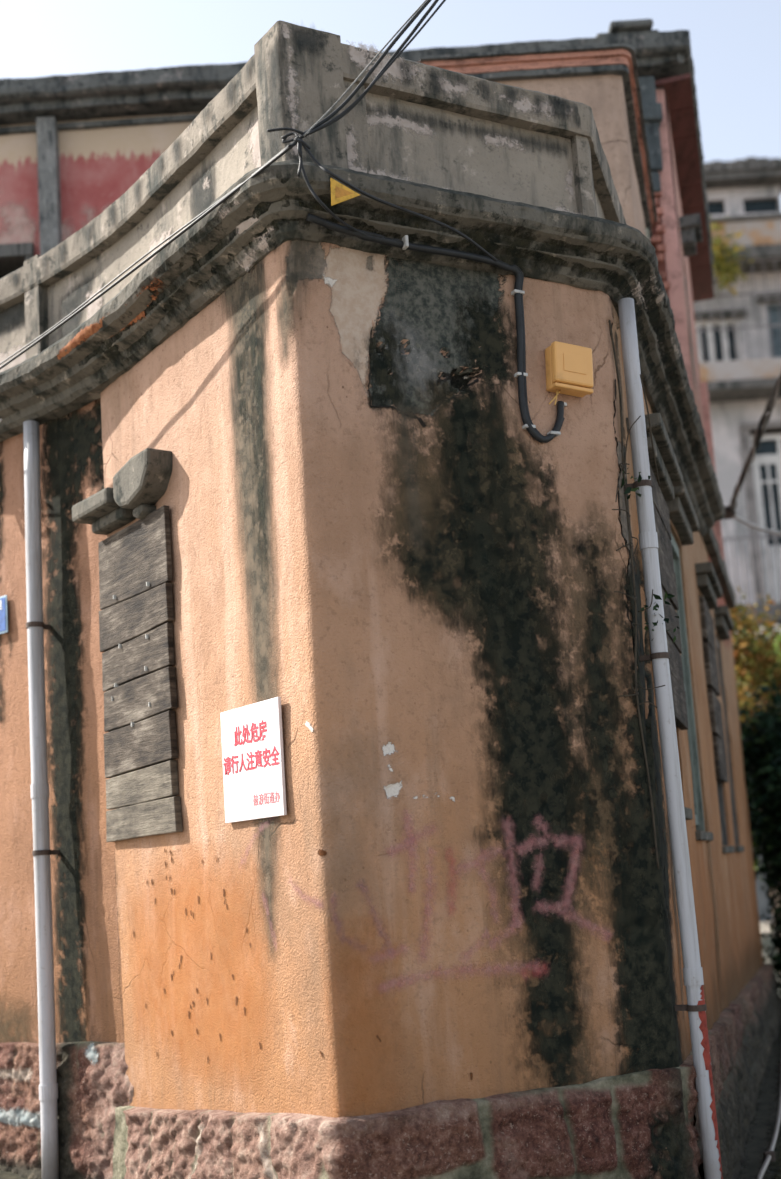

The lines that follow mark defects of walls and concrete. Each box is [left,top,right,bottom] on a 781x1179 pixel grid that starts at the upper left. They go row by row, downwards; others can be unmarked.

leakage [247,23,323,168]
peeling [0,204,36,244]
leakage [148,229,171,263]
leakage [191,168,214,219]
leakage [61,274,102,338]
spalling [280,240,517,427]
leakage [231,279,277,702]
leakage [394,322,691,1087]
leakage [259,817,275,936]